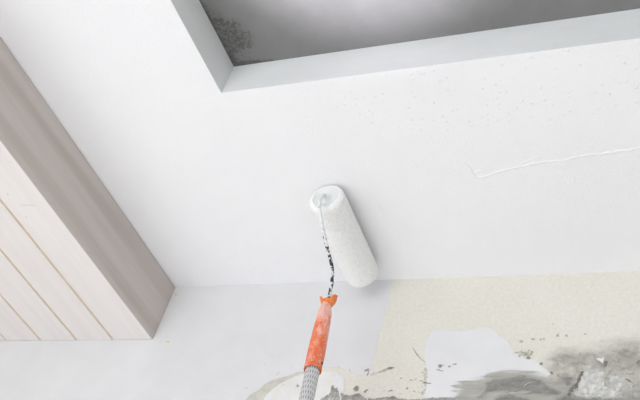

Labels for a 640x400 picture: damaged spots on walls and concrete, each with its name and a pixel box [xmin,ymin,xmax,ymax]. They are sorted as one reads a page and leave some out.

water stain [199,0,274,66]
peeling [246,371,305,400]
peeling [321,327,559,400]
spalling [556,356,639,400]